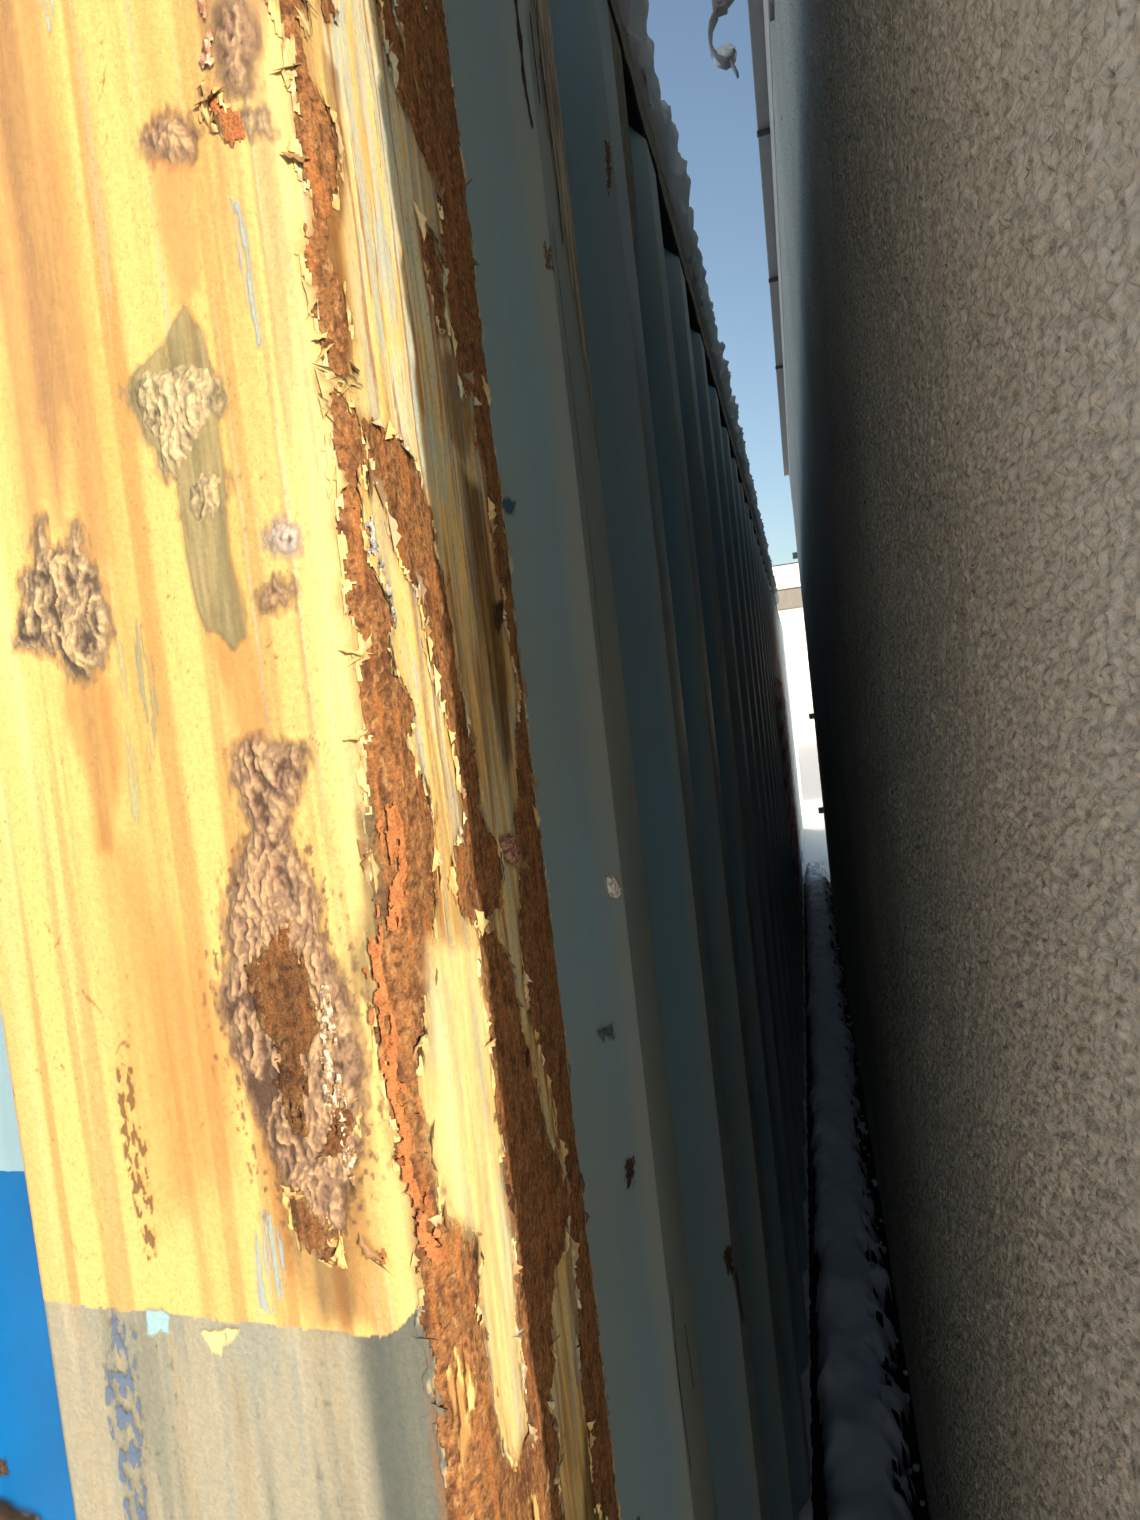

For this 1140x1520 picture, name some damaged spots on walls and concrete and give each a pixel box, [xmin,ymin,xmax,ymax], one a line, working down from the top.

peeling [514,0,599,455]
corrosion [265,0,640,1520]
corrosion [723,1245,744,1318]
corrosion [0,1500,40,1520]